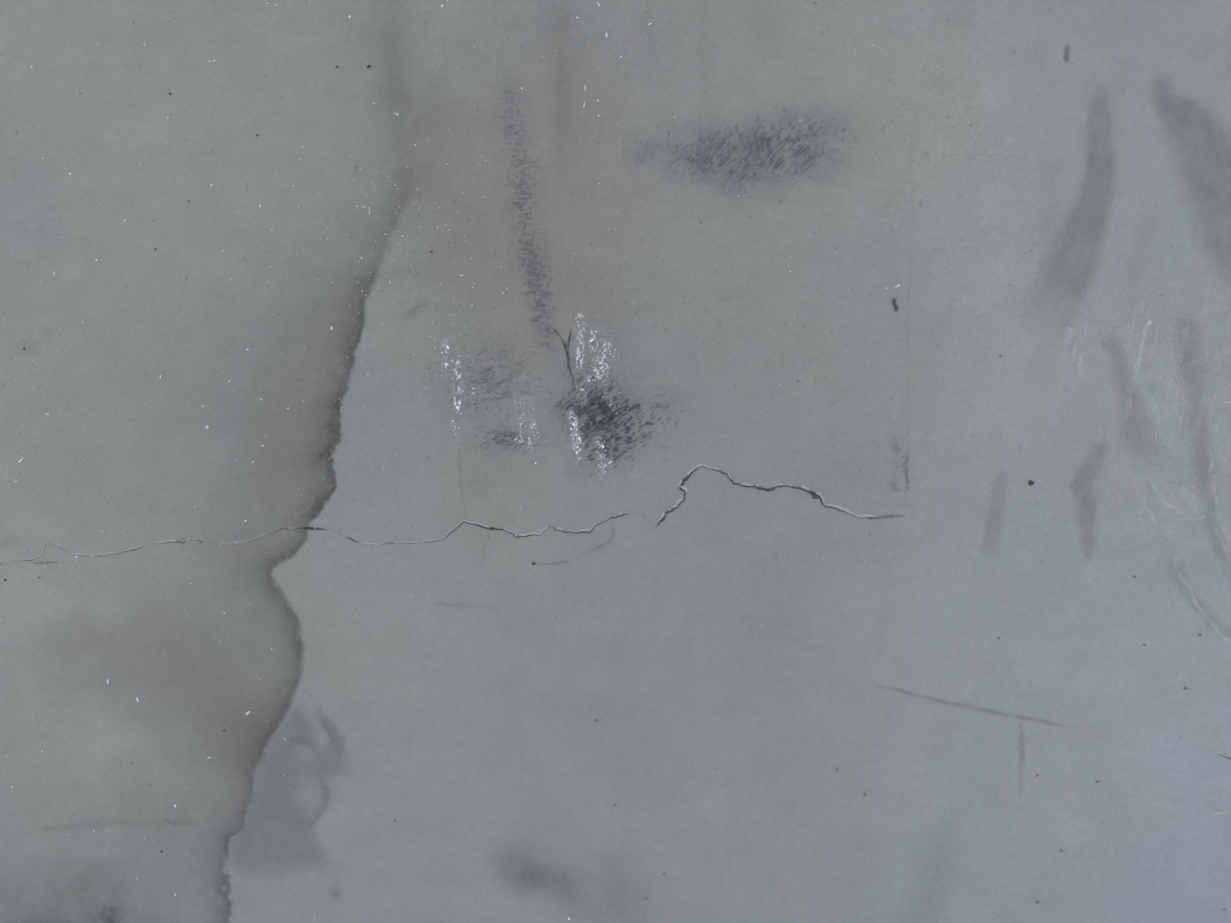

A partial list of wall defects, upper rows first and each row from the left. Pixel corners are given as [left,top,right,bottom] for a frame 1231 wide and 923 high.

crack [656,464,878,527]
crack [0,512,625,565]